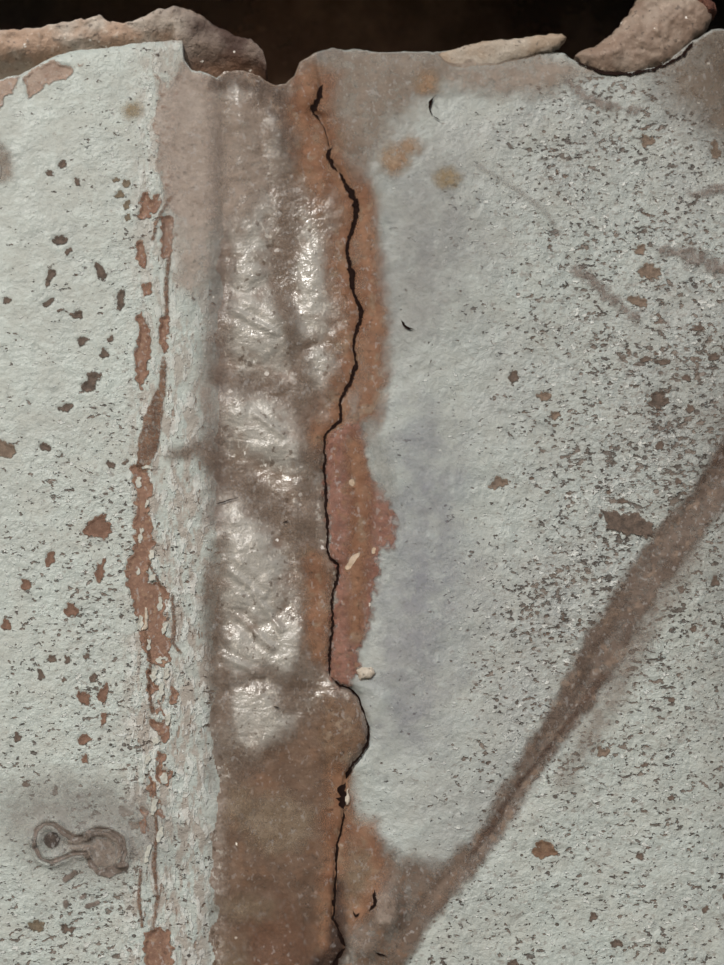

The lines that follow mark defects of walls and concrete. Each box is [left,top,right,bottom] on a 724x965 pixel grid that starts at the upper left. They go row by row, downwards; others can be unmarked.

peeling [438,34,566,68]
peeling [0,60,80,107]
peeling [52,235,73,255]
peeling [42,266,83,319]
peeling [134,311,172,390]
peeling [81,372,102,392]
rust [172,0,724,965]
peeling [82,514,112,540]
crack [310,85,377,965]
peeling [106,459,179,863]
peeling [76,673,109,726]
peeling [142,927,175,965]